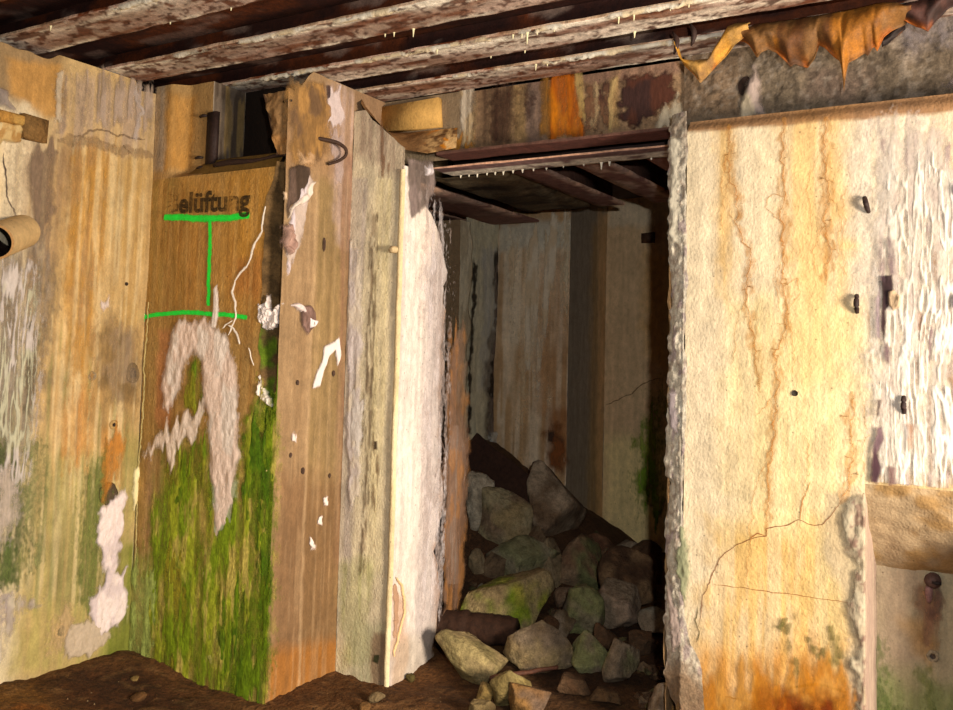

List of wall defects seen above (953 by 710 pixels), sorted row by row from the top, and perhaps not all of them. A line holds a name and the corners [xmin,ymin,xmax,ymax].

crack [3,154,16,216]
peeling [0,122,23,144]
leakage [0,71,66,540]
corrosion [69,146,109,368]
leakage [86,70,153,139]
spalling [252,82,331,442]
corrosion [525,70,679,139]
corrosion [766,119,788,519]
corrosion [105,426,124,493]
leakage [65,285,240,658]
crack [695,483,848,642]
corrosion [703,653,857,710]